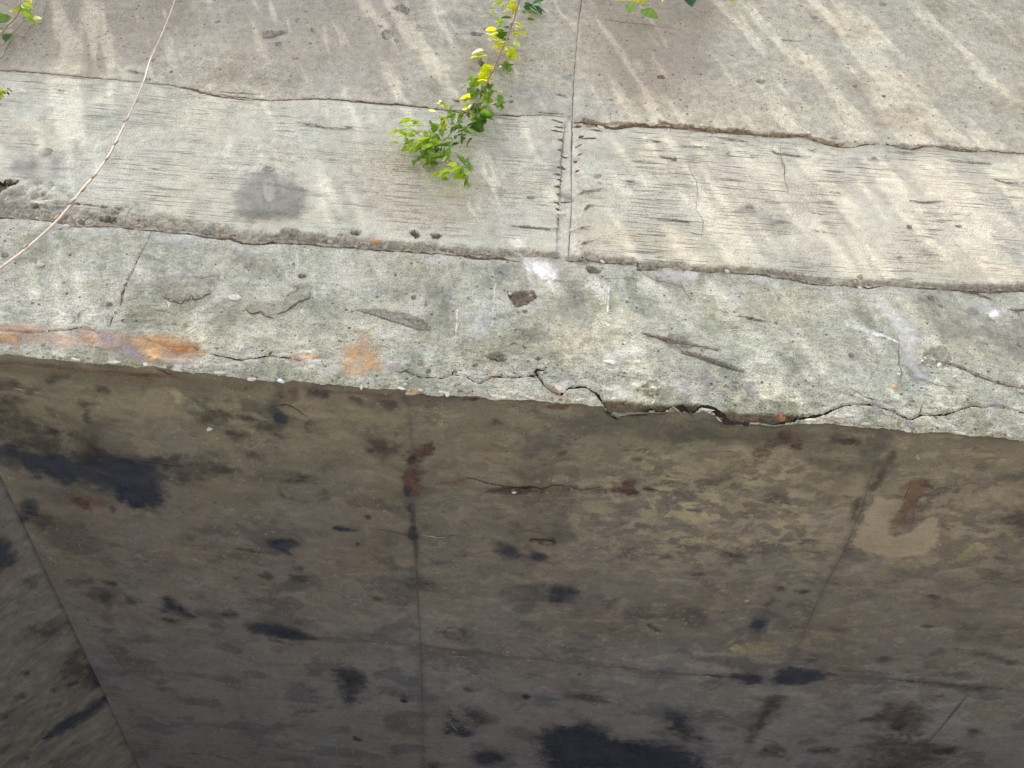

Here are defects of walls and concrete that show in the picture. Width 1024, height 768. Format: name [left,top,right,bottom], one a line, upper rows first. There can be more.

water stain [239,169,304,217]
spalling [507,290,536,313]
corrosion [0,321,200,378]
crack [395,367,611,415]
crack [643,349,1024,426]
water stain [0,402,192,508]
corrosion [403,443,435,497]
crack [467,478,601,494]
water stain [249,623,317,642]
water stain [539,723,703,768]